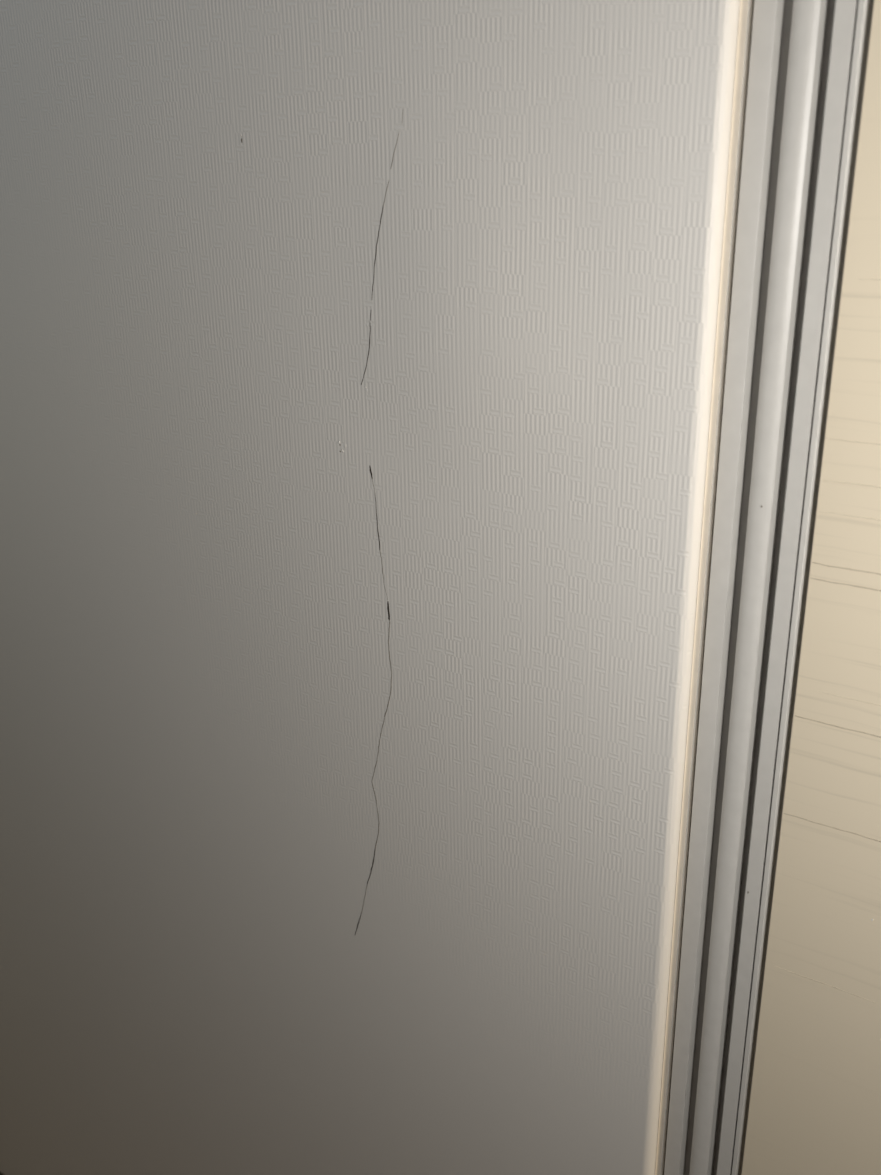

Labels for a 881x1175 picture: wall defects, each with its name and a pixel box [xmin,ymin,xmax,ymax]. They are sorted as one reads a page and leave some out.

crack [361,113,403,385]
crack [355,466,392,934]